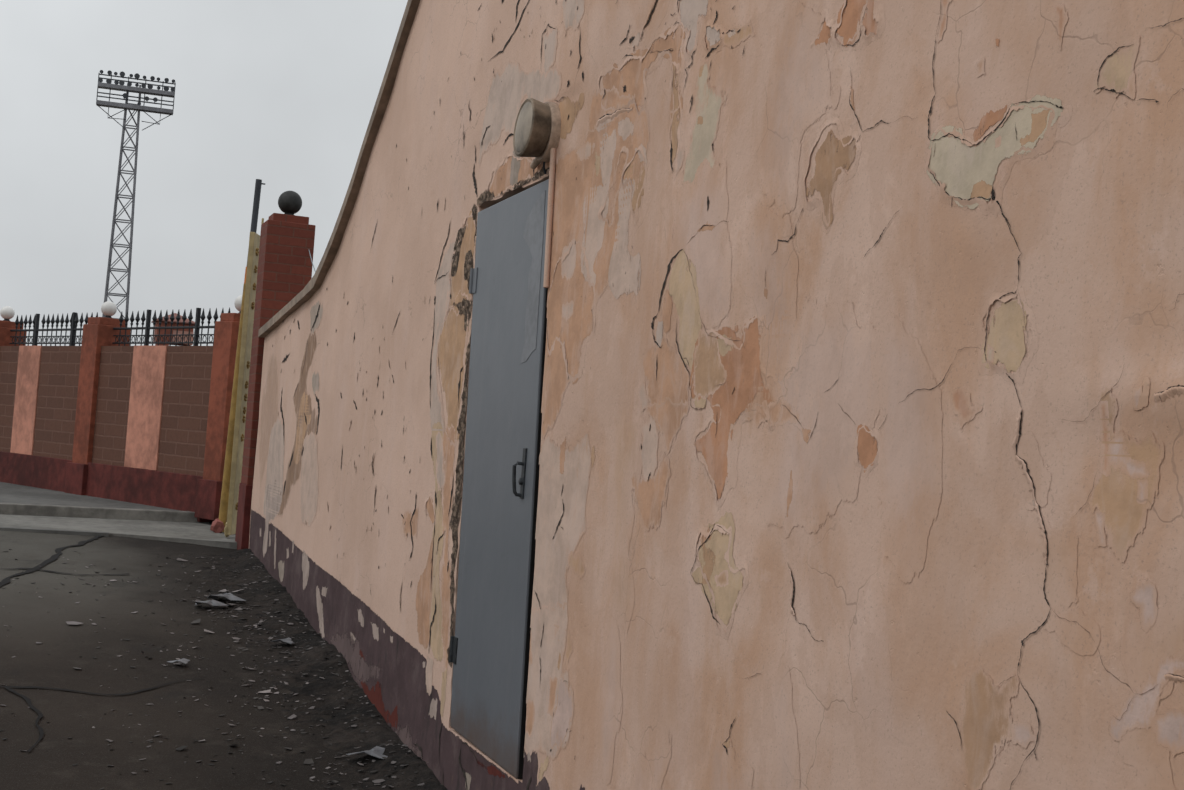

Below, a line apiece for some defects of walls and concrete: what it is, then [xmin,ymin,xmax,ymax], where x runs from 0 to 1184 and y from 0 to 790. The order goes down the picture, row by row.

crack [489,0,529,61]
peeling [810,0,886,53]
peeling [802,116,861,234]
peeling [924,95,1073,217]
crack [994,196,1021,288]
peeling [416,0,755,781]
peeling [638,249,818,640]
peeling [839,405,887,478]
crack [0,536,129,587]
peeling [260,528,294,582]
crack [1008,376,1078,789]
peeling [316,586,423,759]